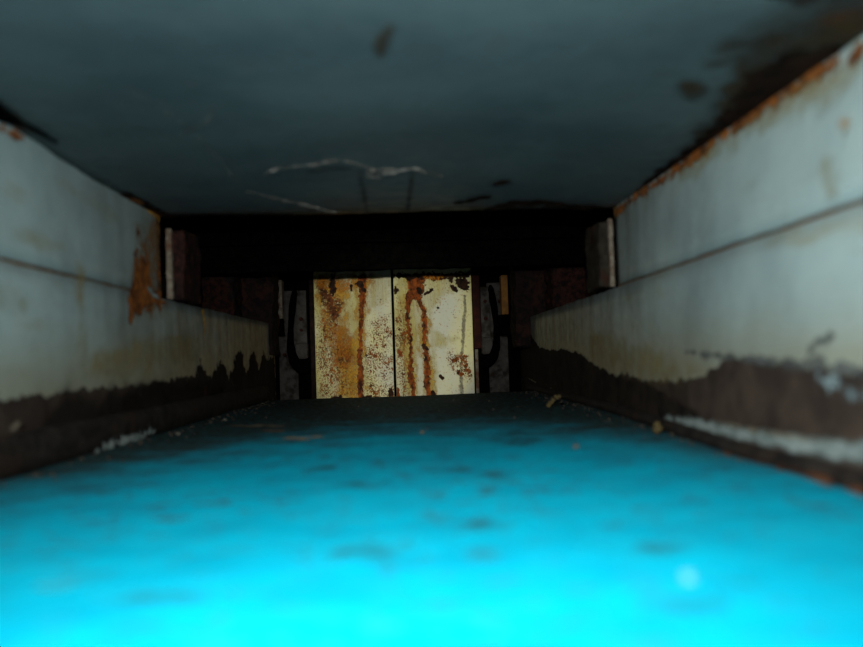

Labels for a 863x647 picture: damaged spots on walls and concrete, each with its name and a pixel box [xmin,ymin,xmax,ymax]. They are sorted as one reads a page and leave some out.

rust [0,103,59,143]
rust [120,193,177,324]
crack [247,192,337,213]
crack [270,160,442,199]
rust [614,0,863,216]
rust [315,270,472,398]